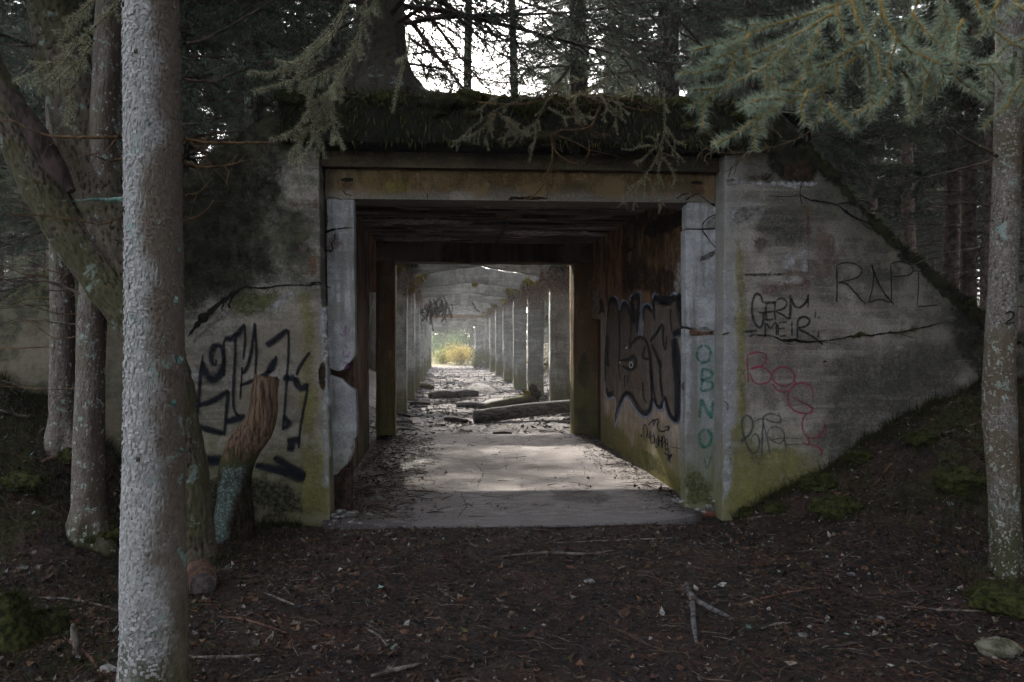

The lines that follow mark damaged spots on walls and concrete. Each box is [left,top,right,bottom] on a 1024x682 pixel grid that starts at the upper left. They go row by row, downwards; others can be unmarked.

crack [775,183,884,229]
crack [187,282,331,338]
crack [768,321,949,345]